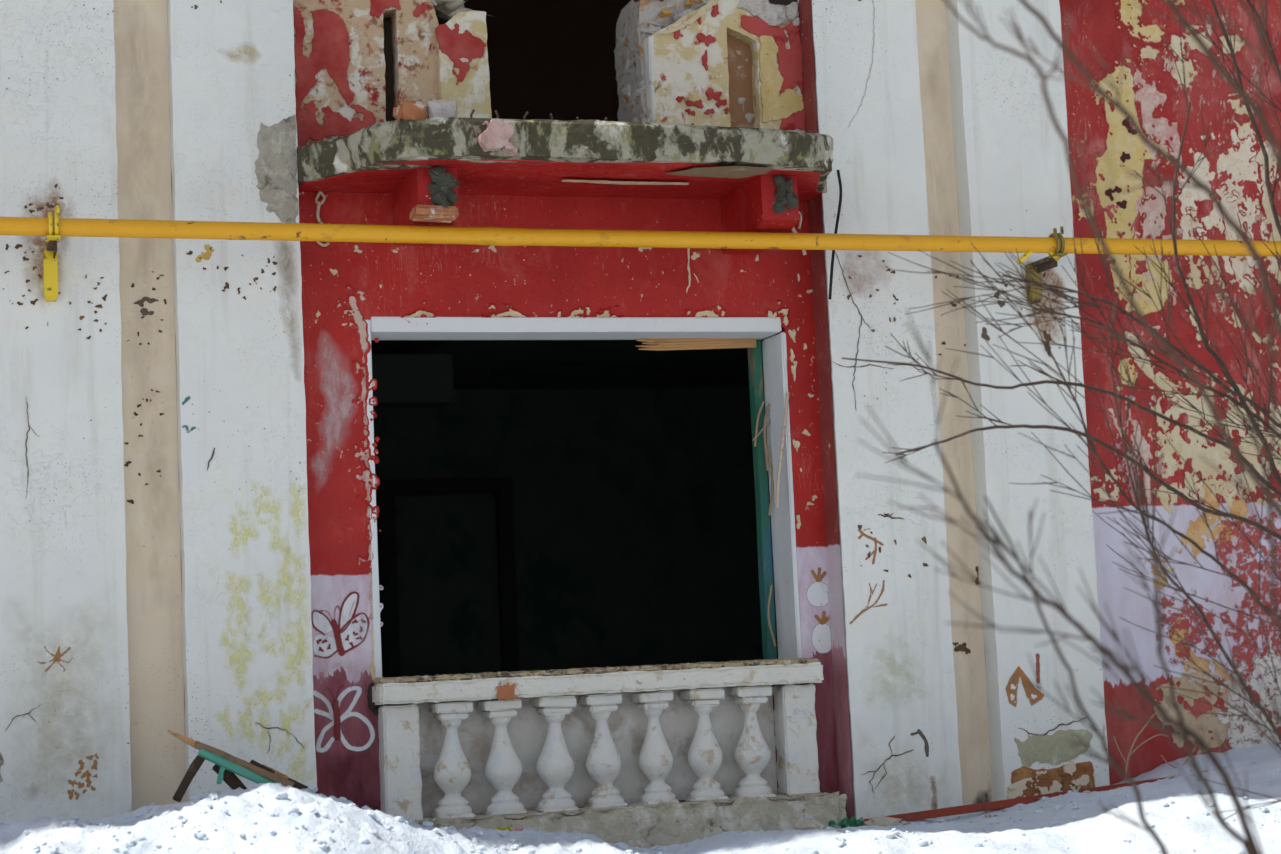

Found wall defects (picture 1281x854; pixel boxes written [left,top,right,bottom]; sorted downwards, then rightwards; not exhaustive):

peeling [255,8,355,223]
spalling [413,0,494,23]
peeling [737,0,805,130]
crack [834,252,937,408]
peeling [1071,0,1281,592]
peeling [316,268,385,716]
peeling [1154,589,1281,754]
flaking render [1006,729,1095,799]